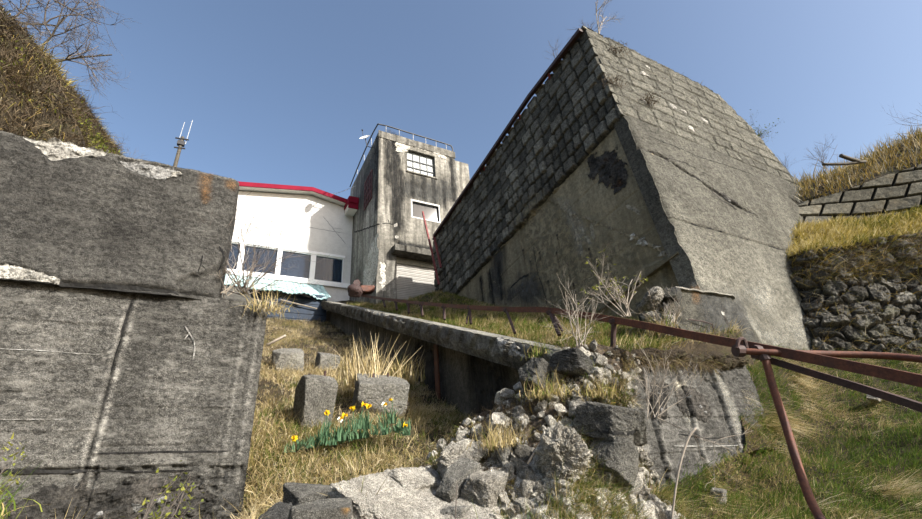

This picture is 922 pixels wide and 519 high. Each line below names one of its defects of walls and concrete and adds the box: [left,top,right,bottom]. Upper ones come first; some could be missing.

spalling [23,136,109,161]
spalling [120,160,182,180]
water stain [359,131,458,249]
crack [637,134,775,218]
crack [685,222,783,250]
spalling [0,264,60,284]